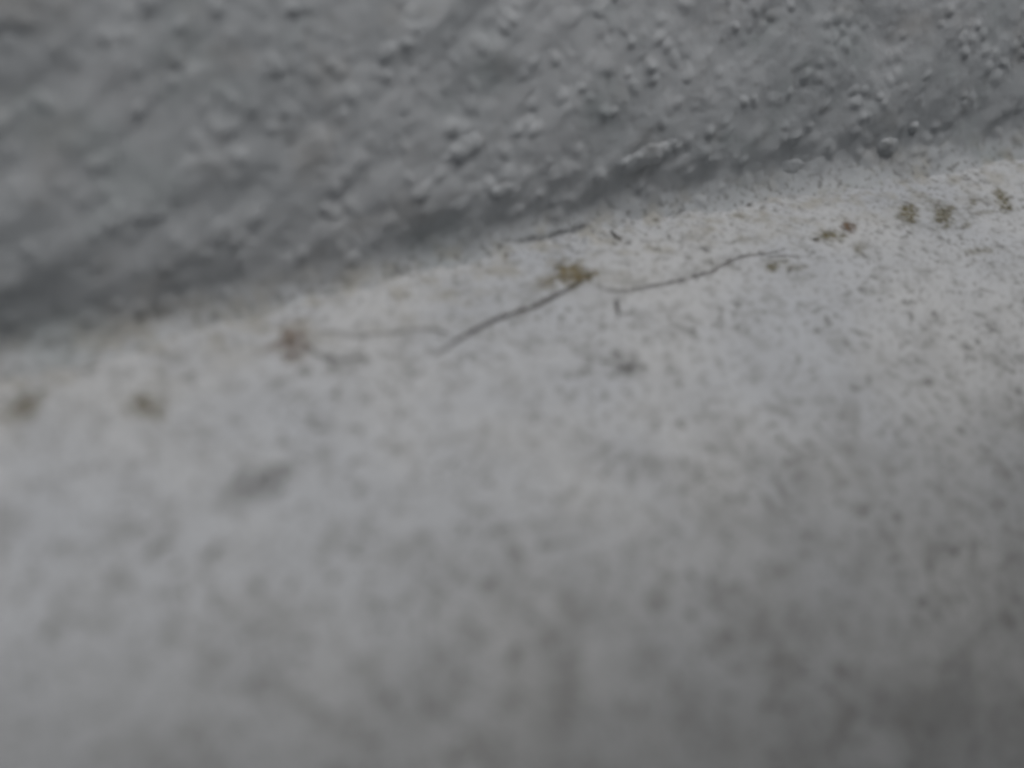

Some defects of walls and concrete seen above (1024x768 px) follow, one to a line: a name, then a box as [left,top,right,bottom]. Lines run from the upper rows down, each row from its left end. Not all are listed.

crack [304,251,801,361]